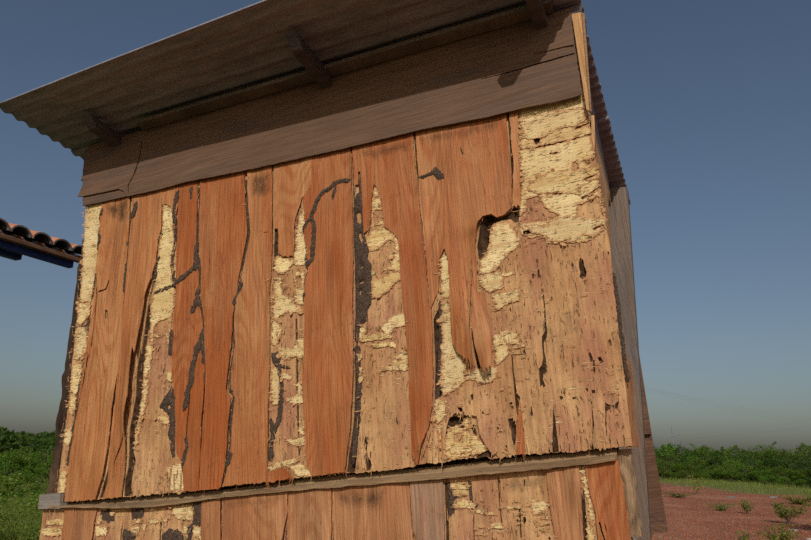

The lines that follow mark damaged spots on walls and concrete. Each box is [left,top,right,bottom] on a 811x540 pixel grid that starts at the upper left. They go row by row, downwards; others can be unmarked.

peeling [361,185,400,307]
peeling [471,83,607,319]
peeling [64,202,102,416]
peeling [127,204,177,451]
peeling [266,200,307,415]
peeling [352,312,409,406]
peeling [425,252,532,460]
peeling [61,425,73,450]
peeling [122,458,184,495]
peeling [127,505,203,540]
peeling [268,457,312,477]
peeling [450,482,558,538]